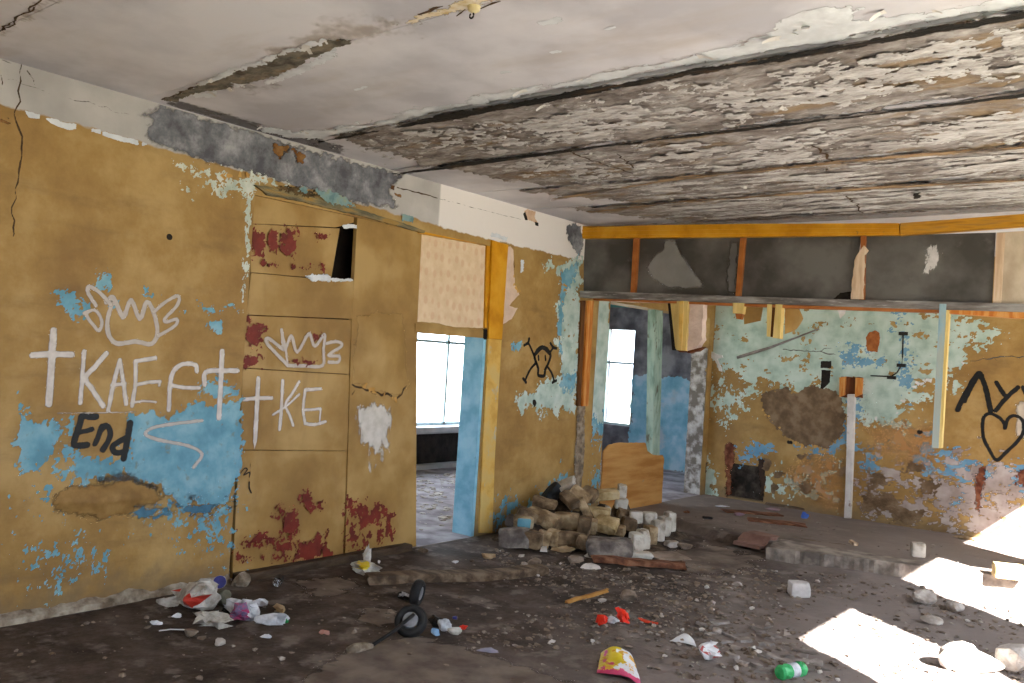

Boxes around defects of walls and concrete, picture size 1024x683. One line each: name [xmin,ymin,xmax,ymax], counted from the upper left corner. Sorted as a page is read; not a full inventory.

crack [1,60,43,236]
flaking render [161,38,351,102]
peeling [257,0,1024,223]
peeling [50,287,91,323]
peeling [95,272,120,309]
peeling [7,374,396,608]
peeling [493,253,610,532]
peeling [628,374,647,443]
rust [724,442,736,496]
peeling [660,292,1024,527]